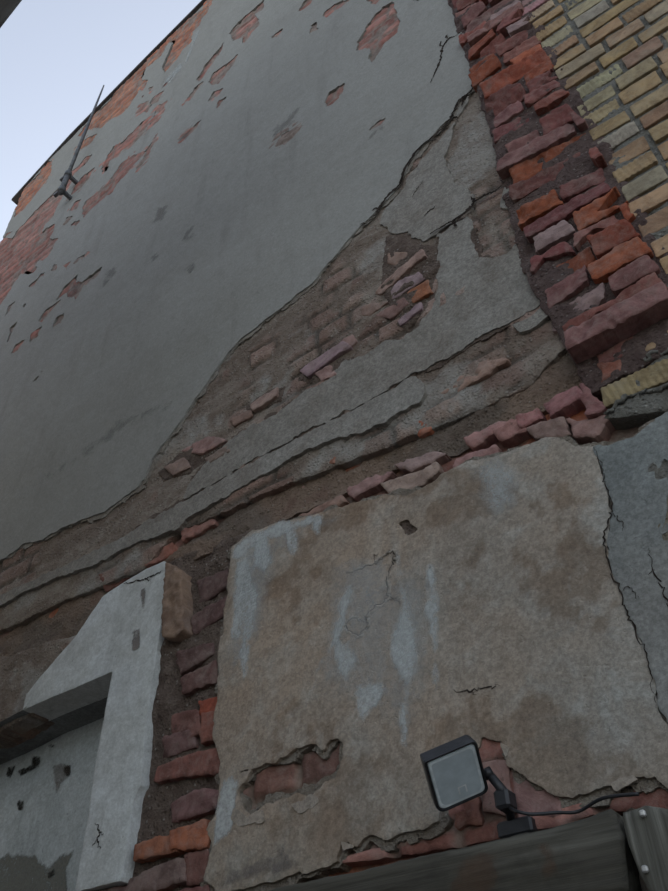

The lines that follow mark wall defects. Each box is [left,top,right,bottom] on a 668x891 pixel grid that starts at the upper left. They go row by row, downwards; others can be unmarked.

crack [431,32,460,81]
flaking render [0,0,213,312]
flaking render [8,270,101,353]
spalling [45,0,668,568]
flaking render [0,573,130,749]
efflorescence [231,517,321,665]
crack [344,548,401,639]
efflorescence [391,602,417,682]
crack [593,447,656,702]
crack [648,548,668,607]
efflorescence [215,780,237,840]
flaking render [231,738,668,891]